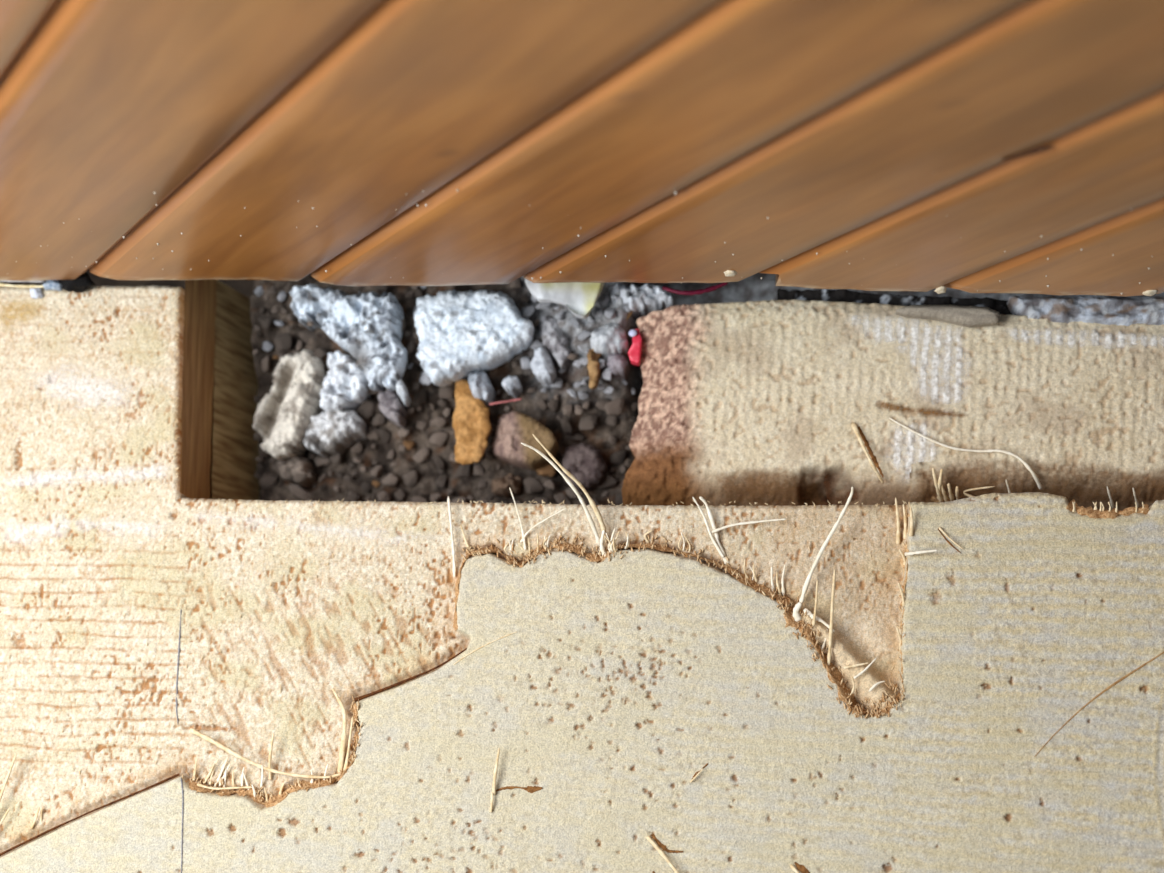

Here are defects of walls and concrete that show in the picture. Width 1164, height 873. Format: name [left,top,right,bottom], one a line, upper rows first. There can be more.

spalling [1066,499,1149,519]
spalling [489,748,542,813]
spalling [646,833,683,873]
spalling [790,862,810,873]